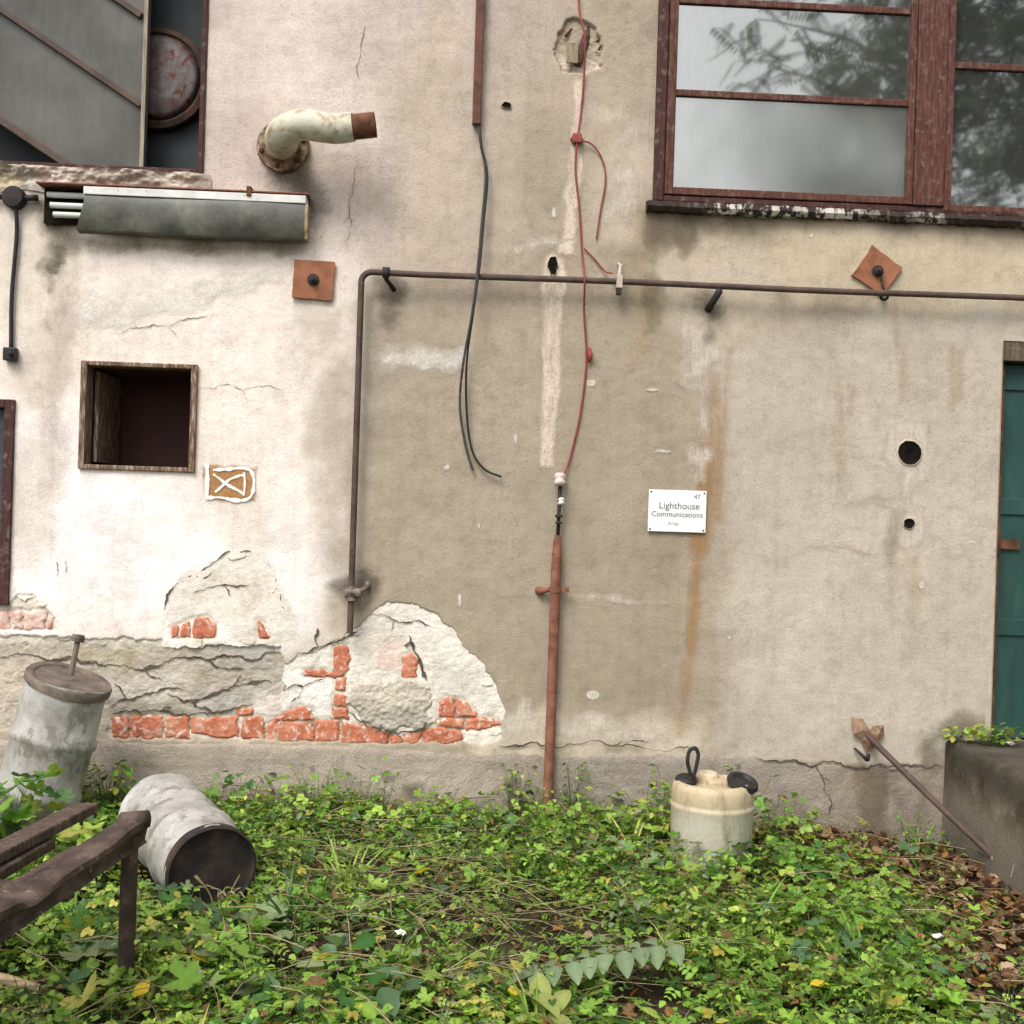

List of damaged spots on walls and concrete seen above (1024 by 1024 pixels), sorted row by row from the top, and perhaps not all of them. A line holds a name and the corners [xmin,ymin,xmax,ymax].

spalling [555,19,603,75]
crack [0,614,427,716]
spalling [0,550,506,745]
crack [500,740,703,752]
crack [756,757,941,812]